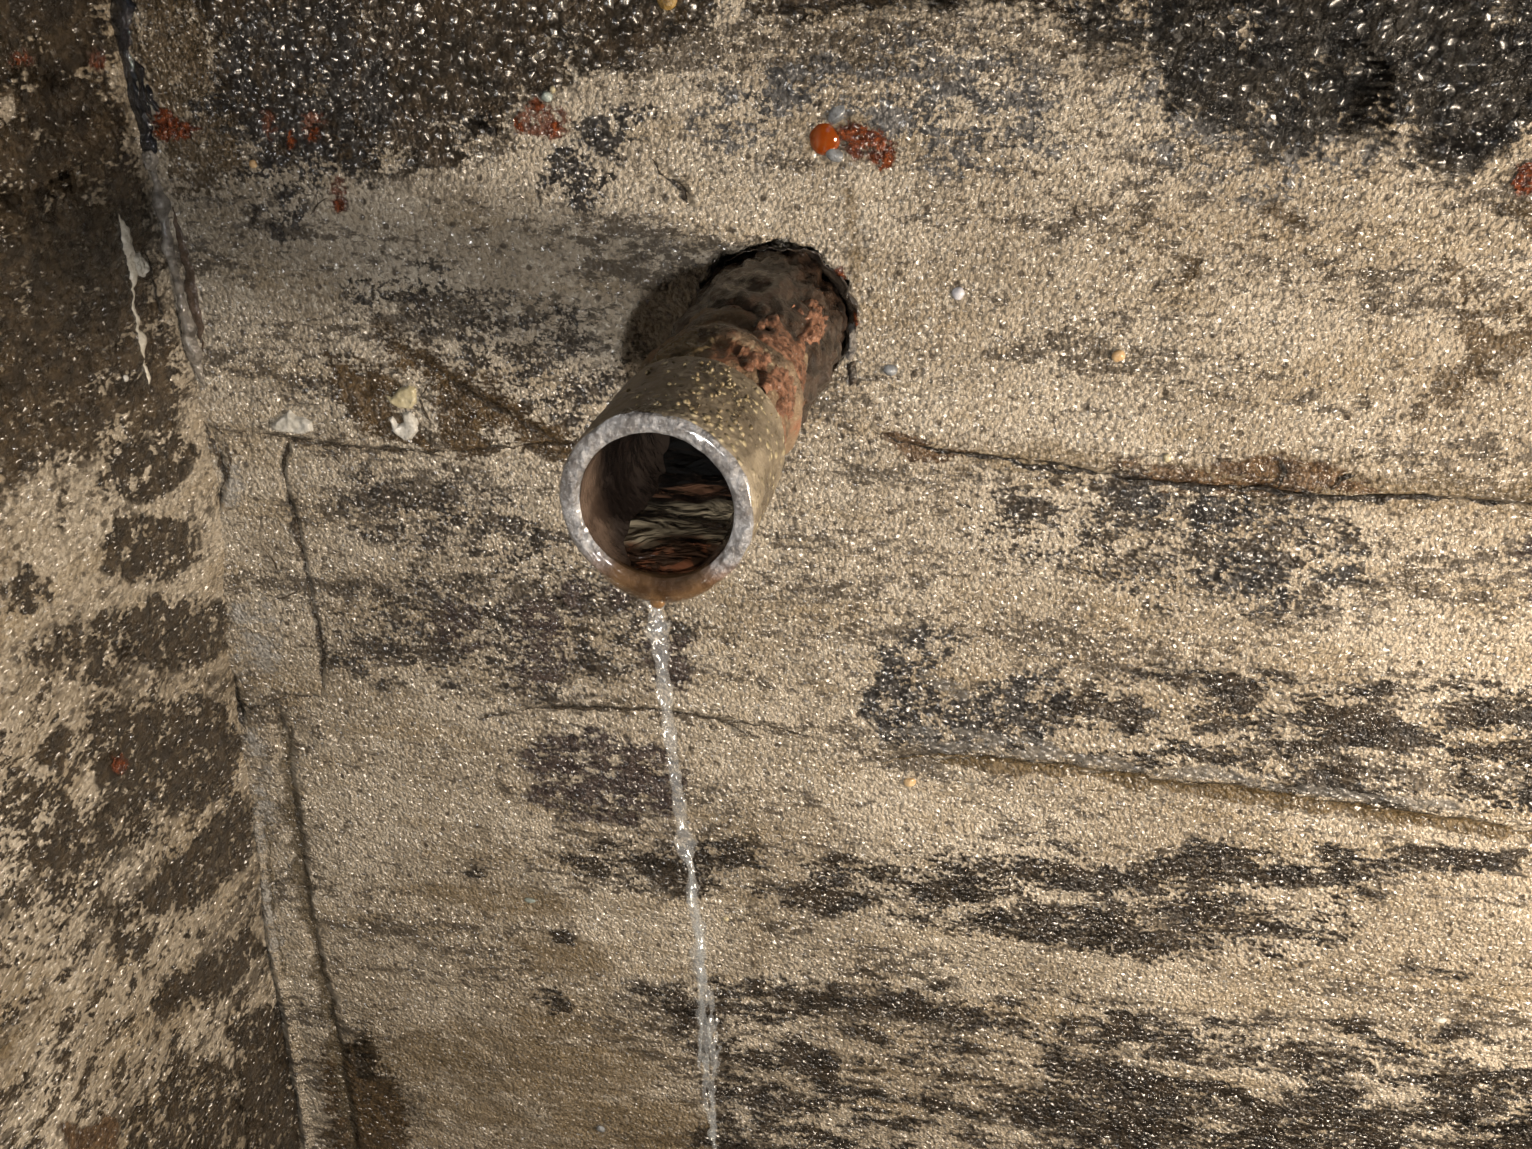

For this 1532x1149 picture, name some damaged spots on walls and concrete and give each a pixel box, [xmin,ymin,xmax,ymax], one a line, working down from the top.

corrosion [152,108,200,143]
corrosion [513,97,571,141]
corrosion [835,122,897,171]
leakage [683,22,1075,181]
leakage [1030,0,1532,225]
corrosion [1511,162,1532,196]
leakage [0,0,861,531]
corrosion [670,244,859,424]
crack [203,331,574,731]
crack [873,430,1532,507]
leakage [1101,452,1381,615]
leakage [1034,1053,1222,1149]